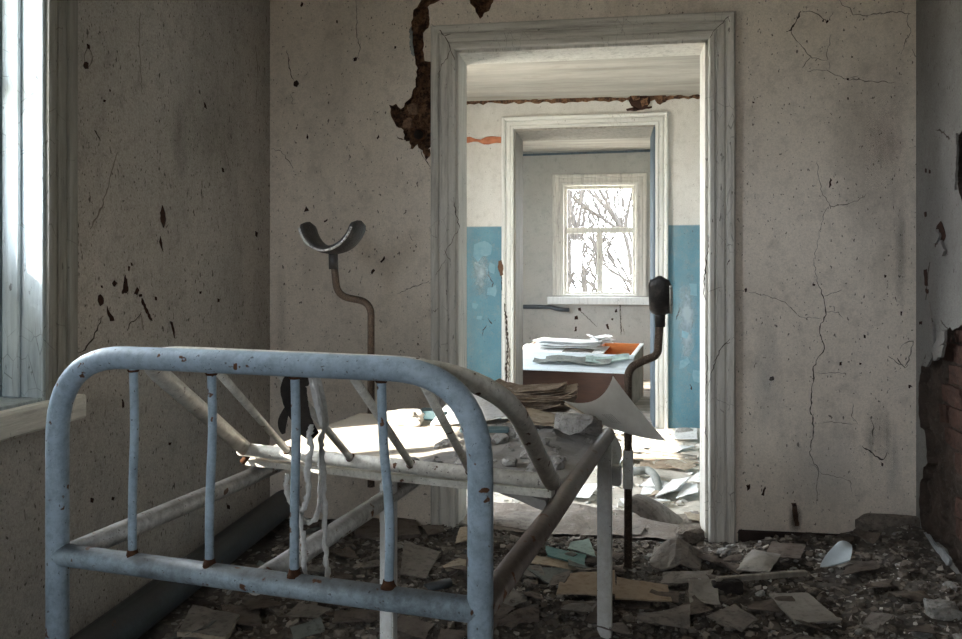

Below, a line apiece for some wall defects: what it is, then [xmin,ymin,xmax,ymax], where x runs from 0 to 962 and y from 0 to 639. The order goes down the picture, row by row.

spalling [470,0,493,18]
crack [787,1,916,83]
spalling [391,0,440,168]
spalling [626,95,667,111]
spalling [467,136,501,144]
flaking render [931,221,947,256]
crack [703,164,887,503]
crack [888,341,914,368]
spalling [919,320,962,566]